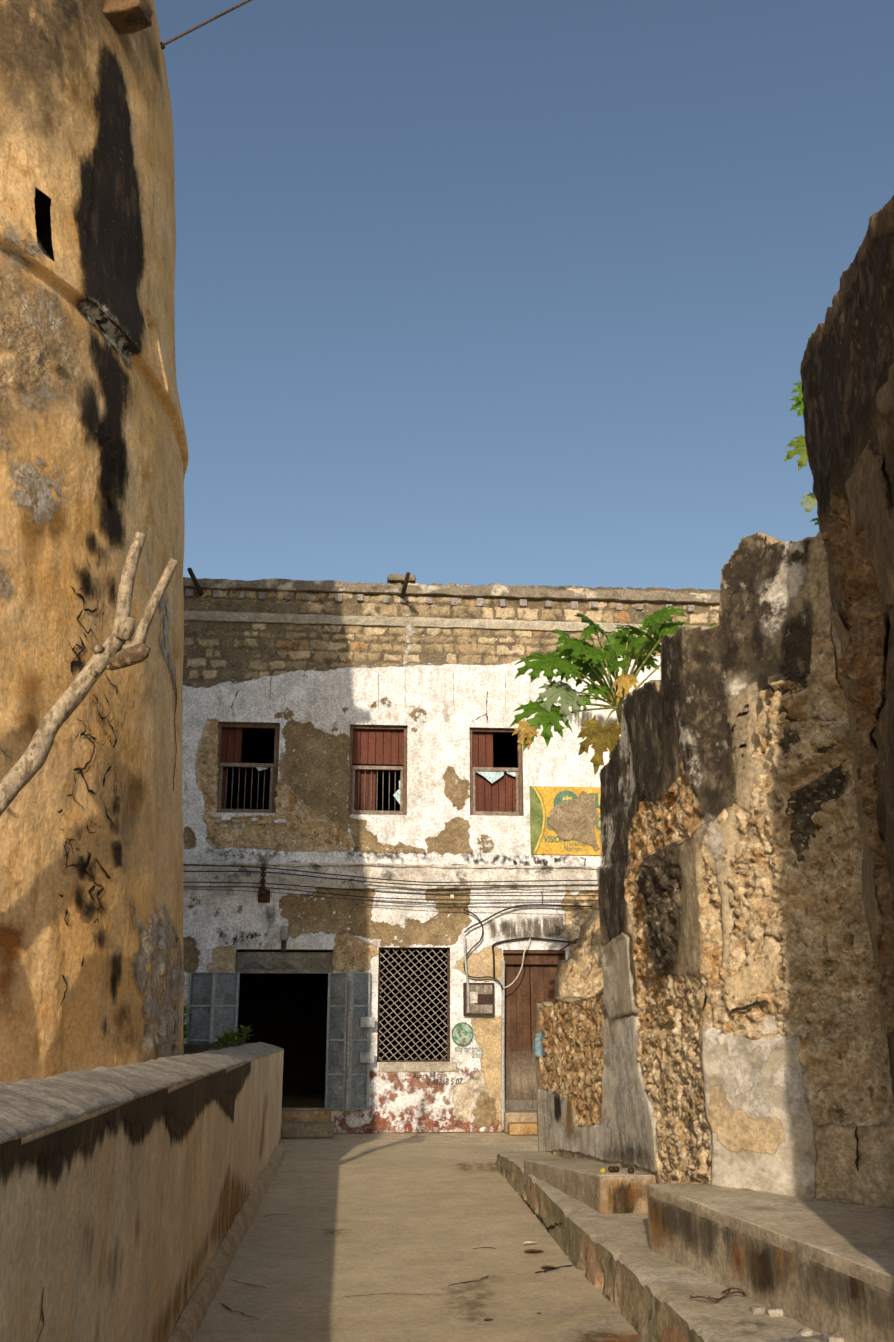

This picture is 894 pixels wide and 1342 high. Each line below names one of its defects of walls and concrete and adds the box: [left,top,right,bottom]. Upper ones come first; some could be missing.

peeling [0,224,132,525]
water stain [0,0,157,601]
crack [58,560,123,1004]
spalling [183,706,494,862]
peeling [130,900,236,1061]
peeling [279,888,472,973]
peeling [455,945,504,982]
spalling [562,890,599,949]
spalling [624,578,894,1209]
water stain [0,1062,251,1186]
peeling [333,1068,501,1134]